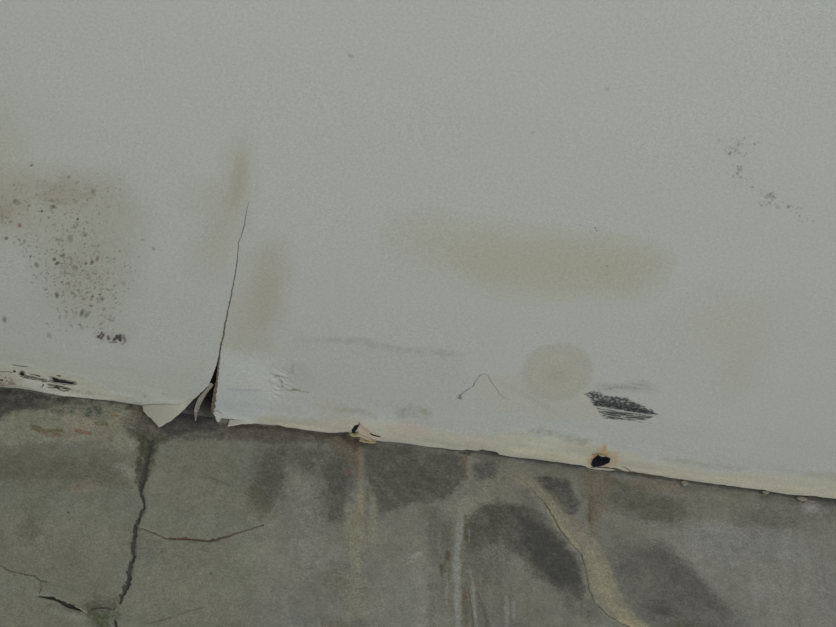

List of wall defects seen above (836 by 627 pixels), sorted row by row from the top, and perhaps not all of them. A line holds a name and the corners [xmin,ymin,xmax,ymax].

crack [0,435,264,627]
crack [185,203,249,421]
peeling [214,411,254,426]
water stain [0,87,470,359]
water stain [0,388,836,627]
water stain [376,202,681,311]
water stain [467,341,656,423]